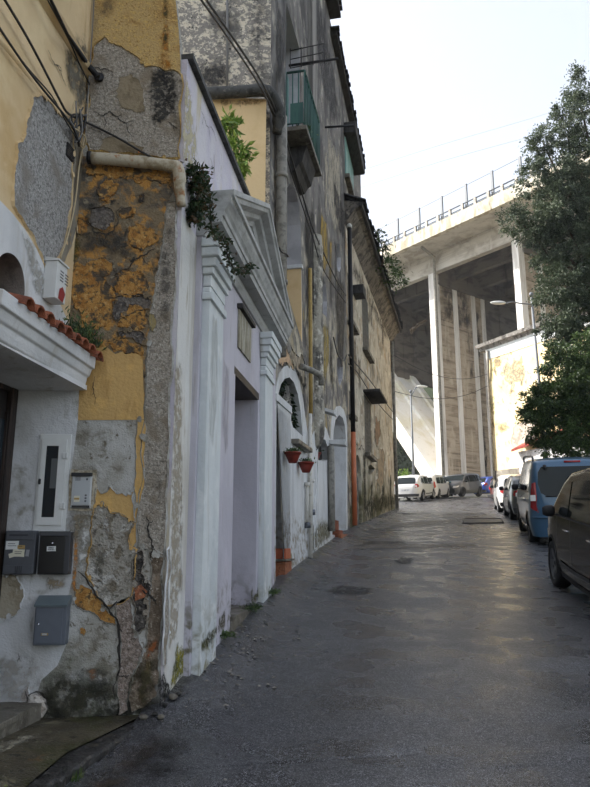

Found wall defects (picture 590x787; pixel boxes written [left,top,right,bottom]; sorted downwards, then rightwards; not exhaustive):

leakage [149,69,196,164]
flaking render [11,36,184,715]
leakage [363,453,392,509]
peeling [0,575,25,623]
crack [78,571,129,700]